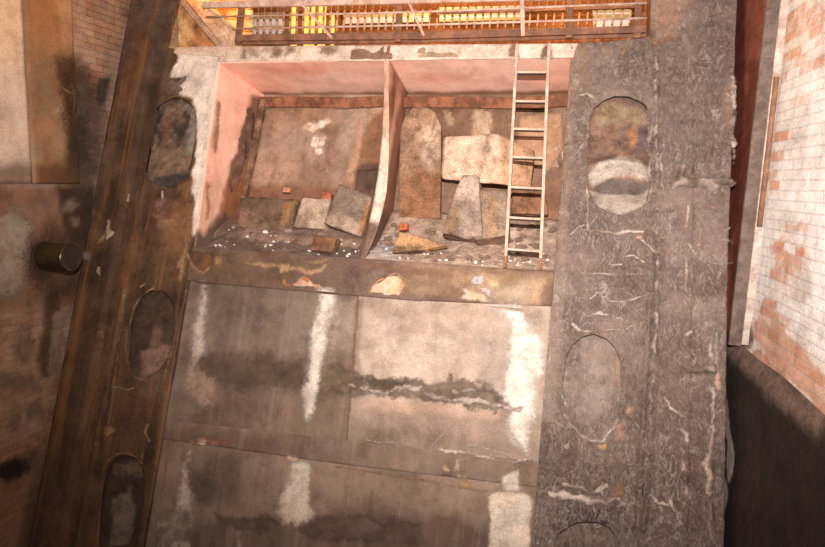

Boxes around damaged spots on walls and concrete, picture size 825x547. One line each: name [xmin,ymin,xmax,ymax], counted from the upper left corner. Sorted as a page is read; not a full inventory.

leakage [285,109,370,162]
peeling [282,276,321,289]
peeling [368,273,527,303]
leakage [185,285,546,547]